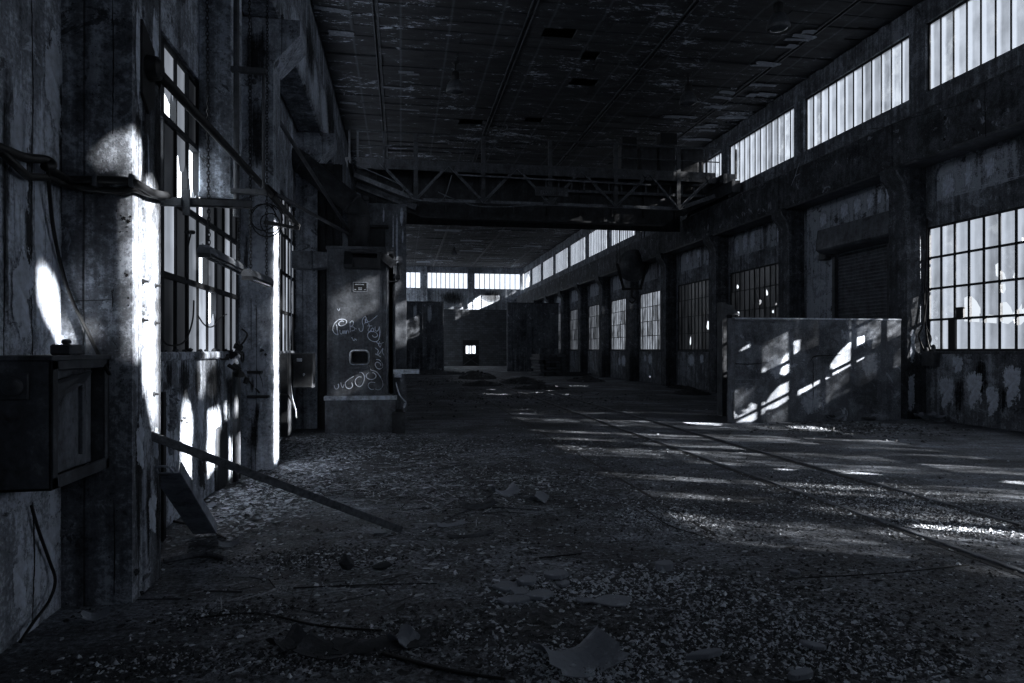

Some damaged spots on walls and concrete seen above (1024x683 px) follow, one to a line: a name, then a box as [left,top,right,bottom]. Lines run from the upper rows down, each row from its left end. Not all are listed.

water stain [3,52,62,352]
peeling [938,355,1021,416]